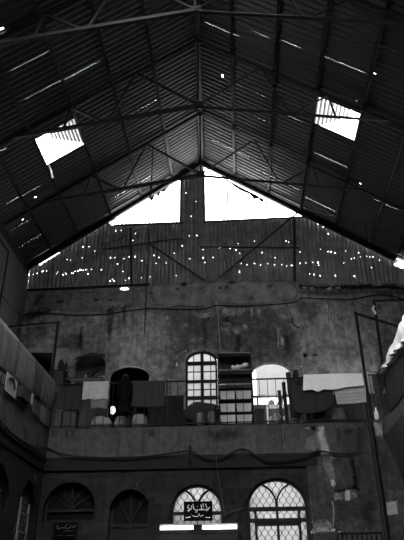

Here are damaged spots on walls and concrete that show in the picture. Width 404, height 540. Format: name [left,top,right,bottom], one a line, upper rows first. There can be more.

flaking render [301,426,357,501]
flaking render [311,520,341,534]